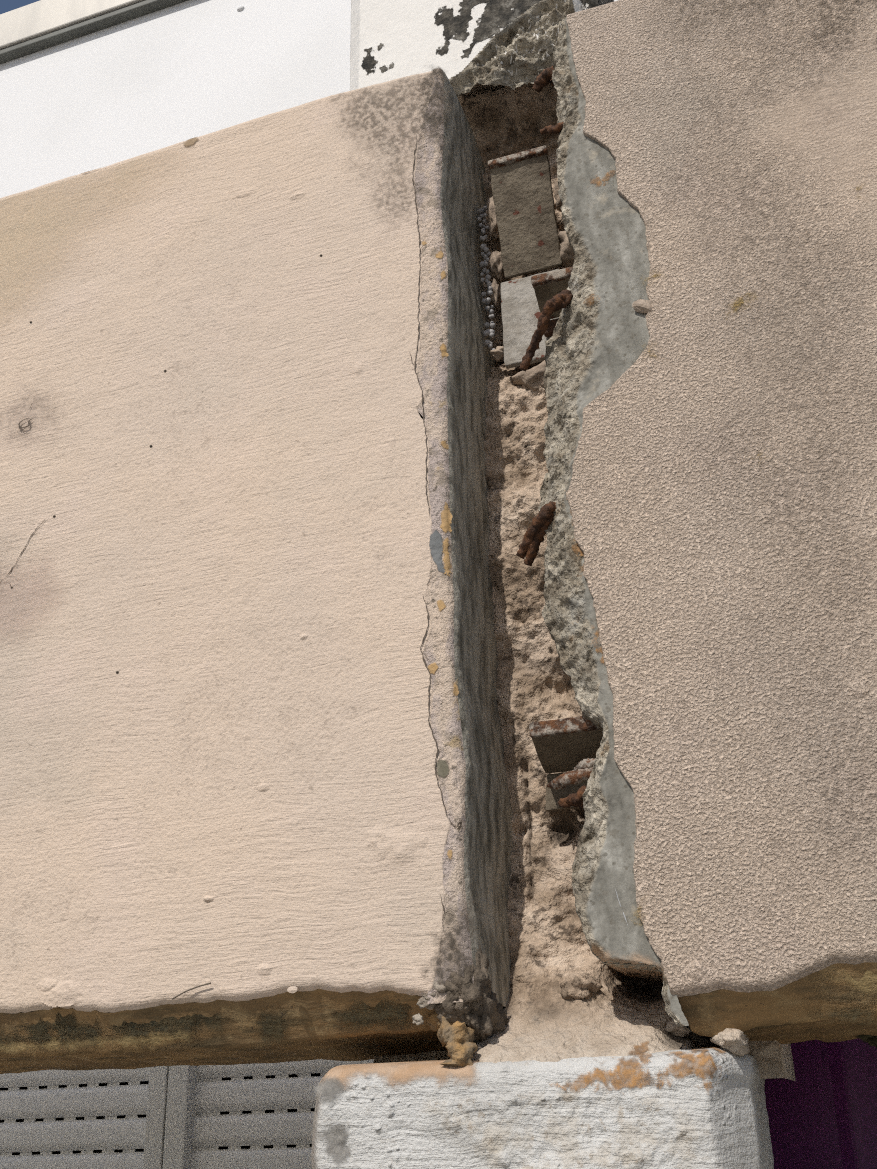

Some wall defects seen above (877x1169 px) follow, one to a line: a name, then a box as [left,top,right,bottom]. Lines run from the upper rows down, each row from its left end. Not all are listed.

spalling [434,0,694,1033]
water stain [847,970,877,991]
spalling [412,945,510,1067]
water stain [0,1040,104,1052]
water stain [118,1035,187,1046]
corrosion [556,1042,726,1090]